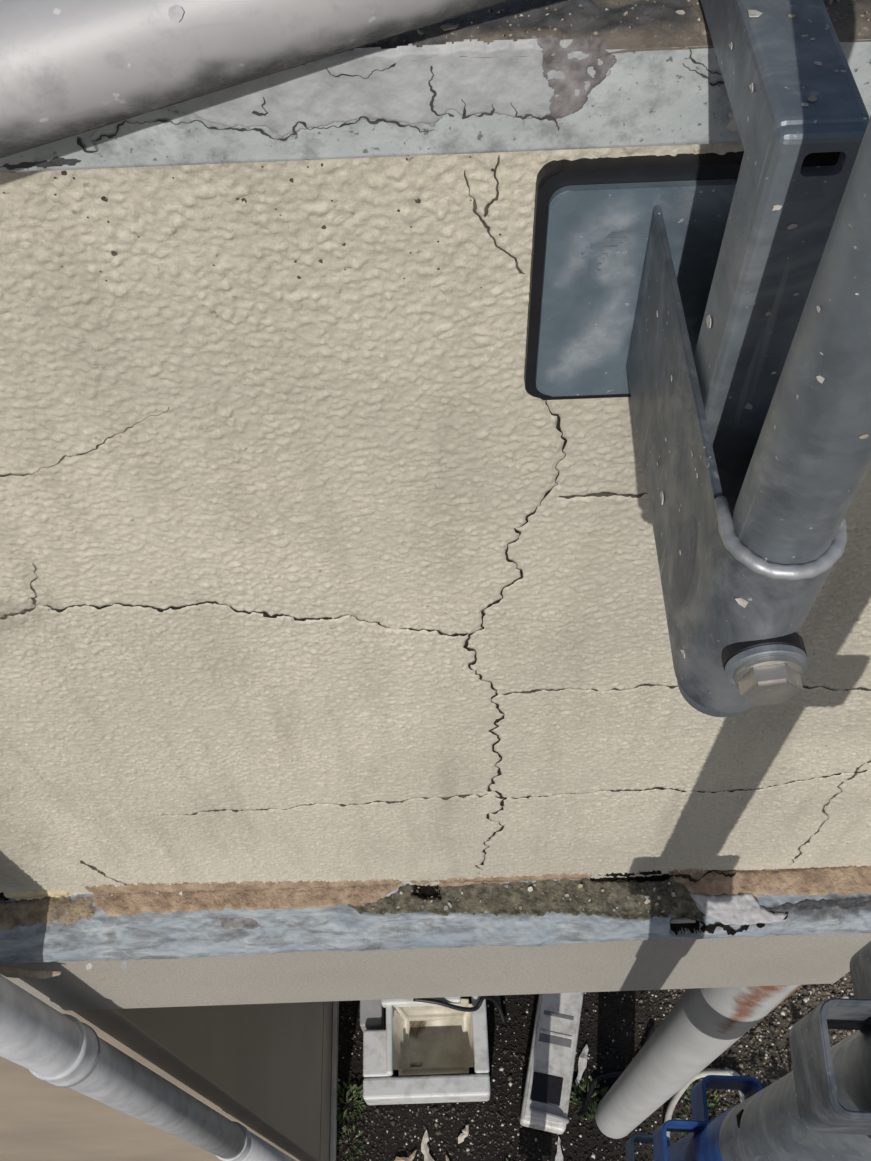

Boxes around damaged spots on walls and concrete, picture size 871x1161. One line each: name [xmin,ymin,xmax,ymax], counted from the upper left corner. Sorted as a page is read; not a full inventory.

peeling [0,39,611,173]
crack [683,49,725,86]
crack [464,155,524,274]
crack [0,400,871,870]
crack [80,861,126,885]
spalling [0,864,871,936]